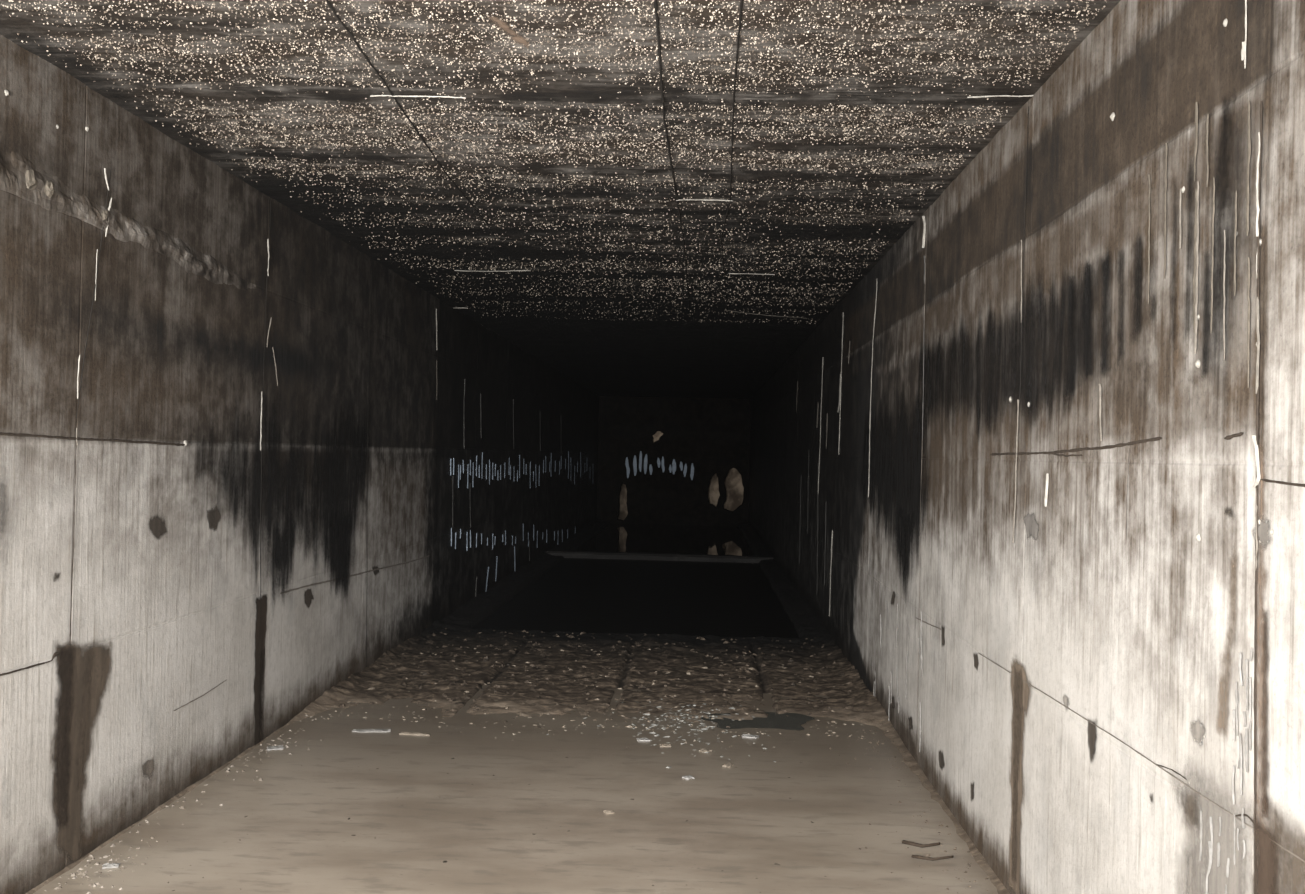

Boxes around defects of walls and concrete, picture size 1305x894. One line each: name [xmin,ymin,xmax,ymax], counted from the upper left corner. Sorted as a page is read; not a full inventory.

damp [1099,101,1262,441]
damp [302,506,356,595]
damp [868,281,877,497]
damp [1009,396,1030,543]
damp [1252,435,1261,570]
damp [52,643,111,862]
damp [1008,660,1030,894]